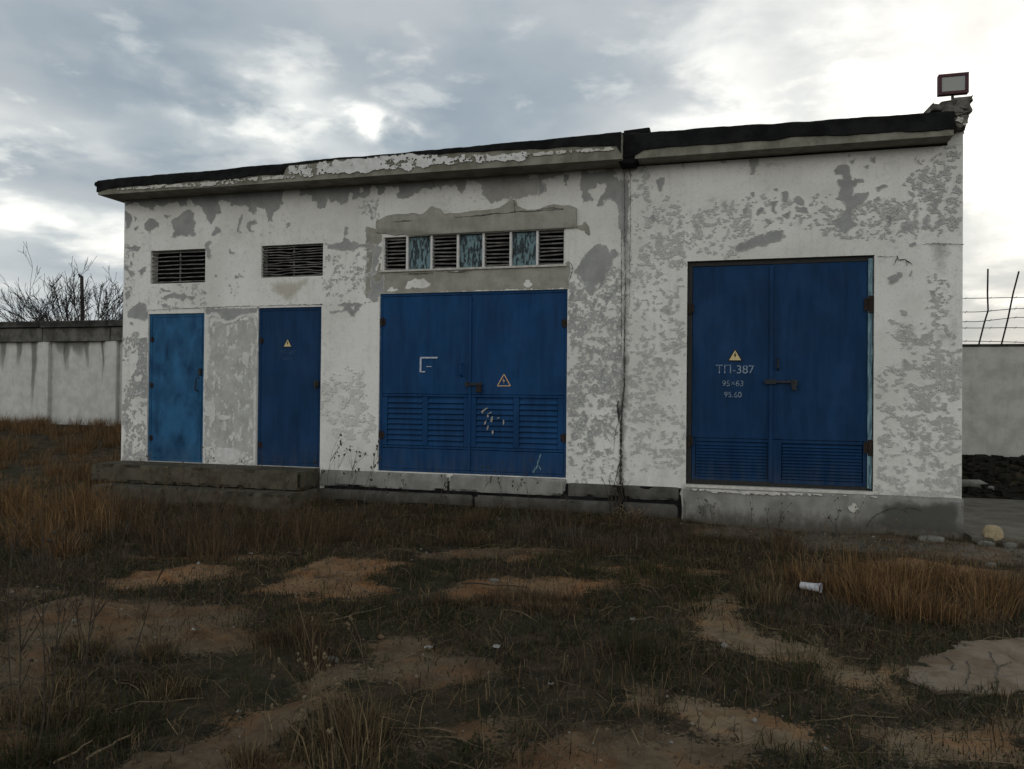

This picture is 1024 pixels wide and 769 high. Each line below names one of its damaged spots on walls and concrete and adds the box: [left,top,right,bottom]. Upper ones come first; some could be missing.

peeling [118,95,973,513]
crack [613,170,631,485]